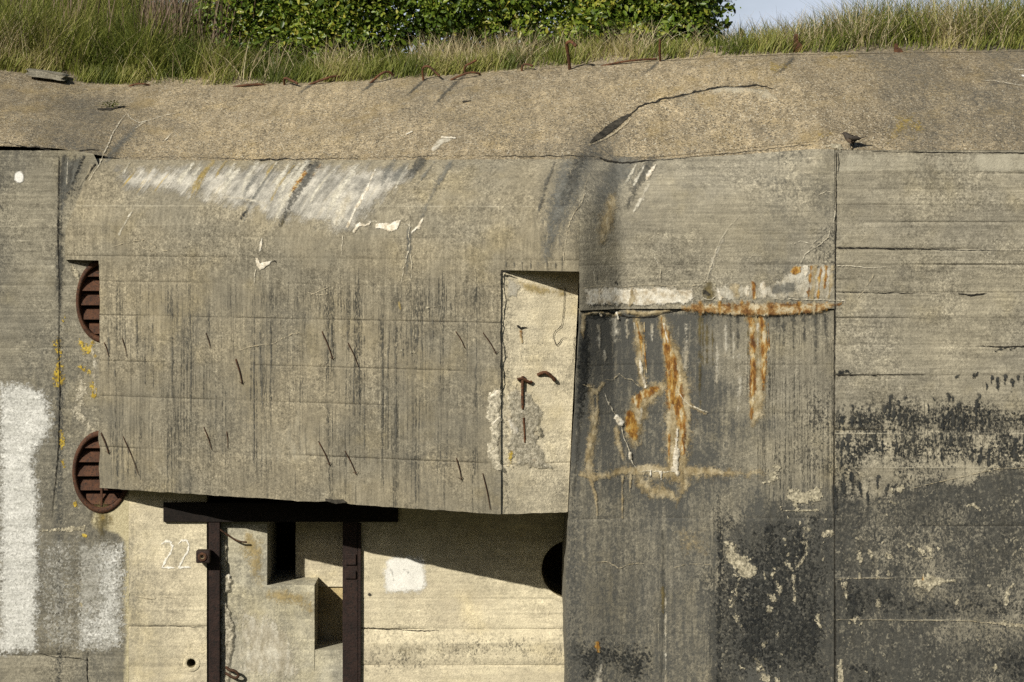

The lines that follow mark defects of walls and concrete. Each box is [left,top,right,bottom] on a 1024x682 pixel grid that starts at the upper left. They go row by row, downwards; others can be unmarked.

crack [628,84,773,115]
leakage [115,136,456,231]
spalling [486,371,556,471]
corrosion [625,315,707,480]
corrosion [683,283,844,427]
leakage [710,371,1024,682]